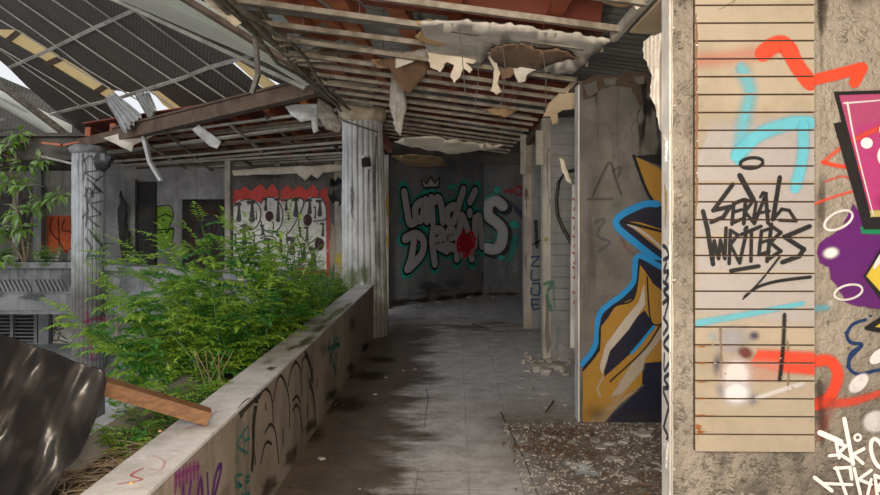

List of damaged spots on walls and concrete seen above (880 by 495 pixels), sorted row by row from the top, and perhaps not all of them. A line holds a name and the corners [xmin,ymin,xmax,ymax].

spalling [581,72,652,106]
crack [500,412,538,495]